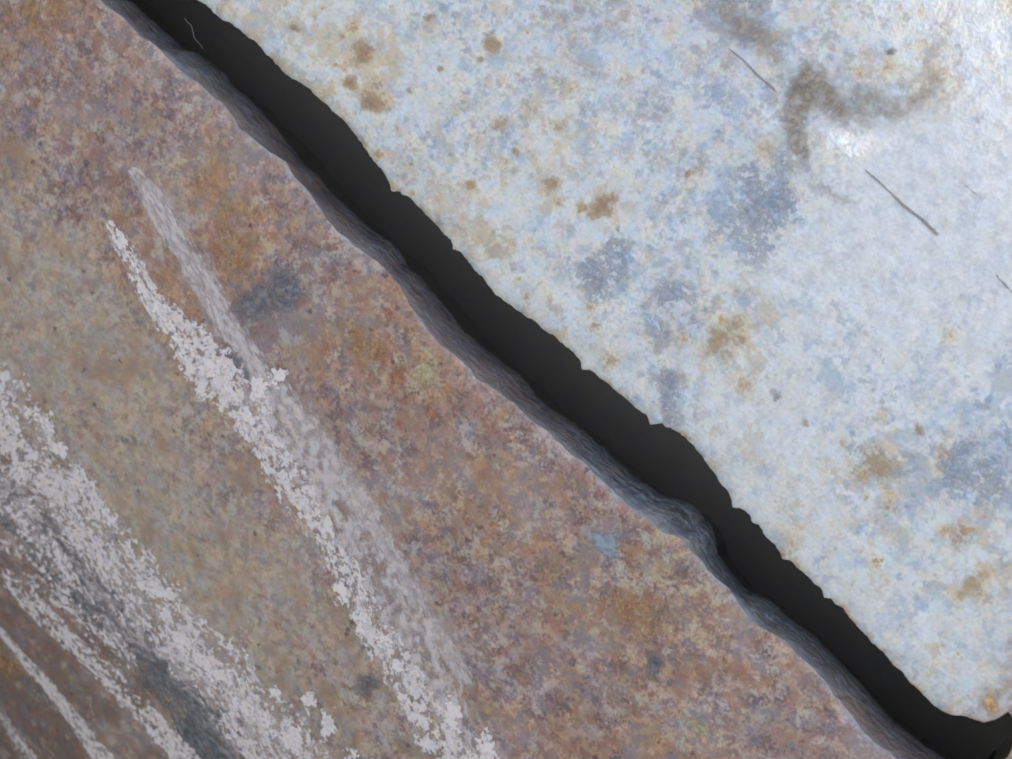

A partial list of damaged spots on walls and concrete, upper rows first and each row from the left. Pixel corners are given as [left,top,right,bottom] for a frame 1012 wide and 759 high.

rust [353,40,374,63]
rust [478,33,502,61]
rust [343,76,385,112]
rust [578,193,618,219]
peeling [108,220,289,430]
rust [708,322,745,357]
rust [864,452,899,478]
rust [952,525,975,546]
peeling [331,578,426,681]
peeling [124,576,338,758]
crack [982,689,998,716]
peeling [444,691,500,759]